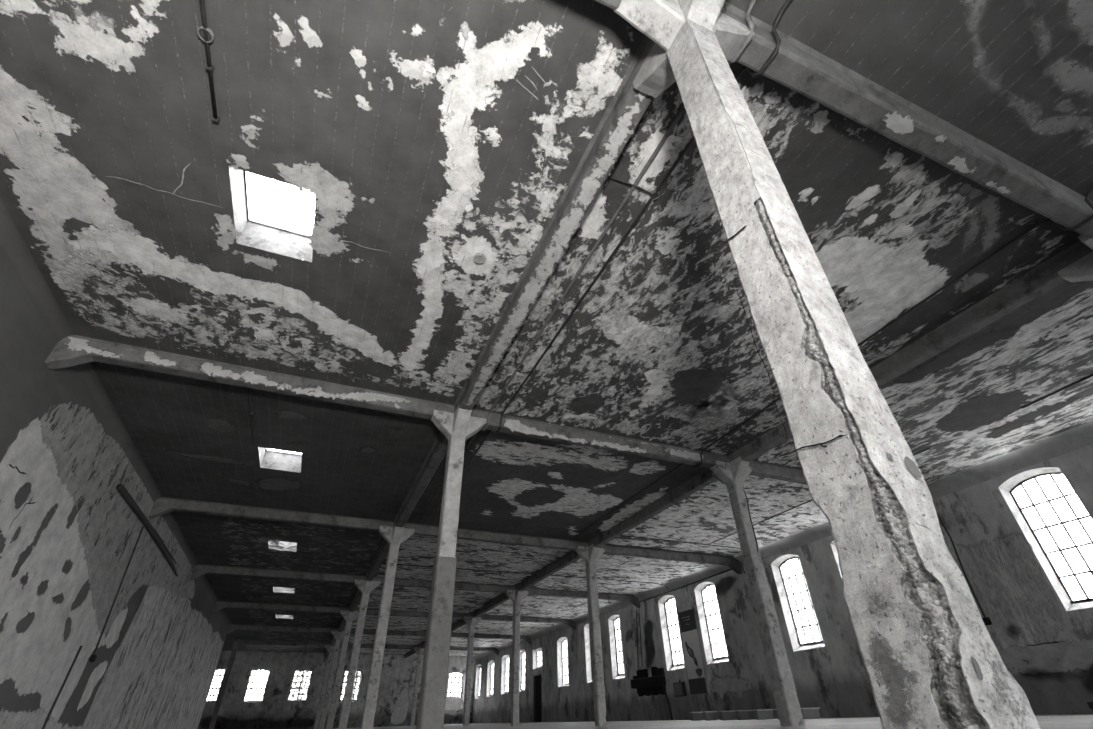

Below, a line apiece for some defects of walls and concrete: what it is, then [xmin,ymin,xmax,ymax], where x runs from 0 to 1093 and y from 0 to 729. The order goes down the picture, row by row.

peeling [0,0,169,75]
peeling [0,13,788,656]
peeling [738,83,867,165]
peeling [797,188,822,205]
spalling [743,197,989,729]
peeling [807,148,984,366]
peeling [882,111,921,135]
peeling [879,287,1093,484]
peeling [948,181,1064,315]
peeling [0,402,224,729]